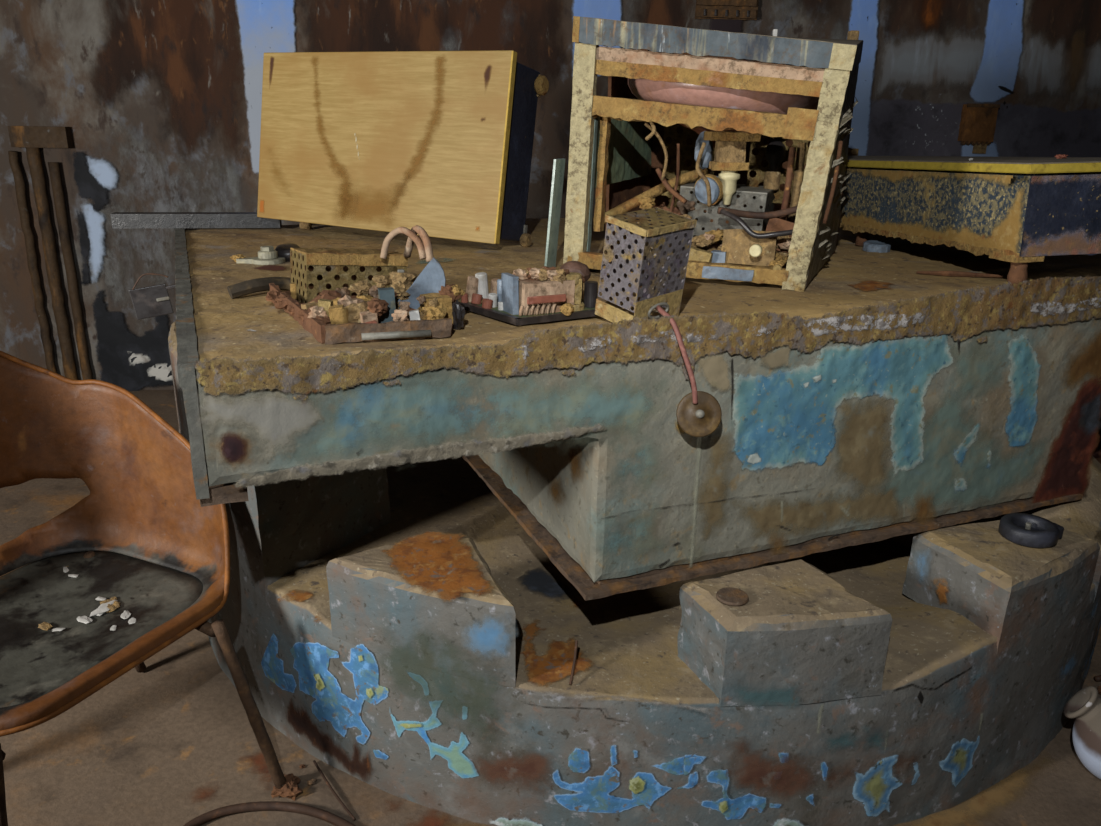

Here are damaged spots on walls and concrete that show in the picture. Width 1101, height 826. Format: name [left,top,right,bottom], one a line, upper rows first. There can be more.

corrosion [886,0,976,39]
corrosion [221,433,248,463]
spalling [194,276,1101,508]
corrosion [1033,332,1101,503]
corrosion [382,531,494,602]
corrosion [522,620,592,687]
peeling [261,633,389,760]
peeling [391,672,479,778]
peeling [552,745,781,820]
peeling [852,755,920,817]
peeling [939,736,980,788]
leakage [490,818,542,826]